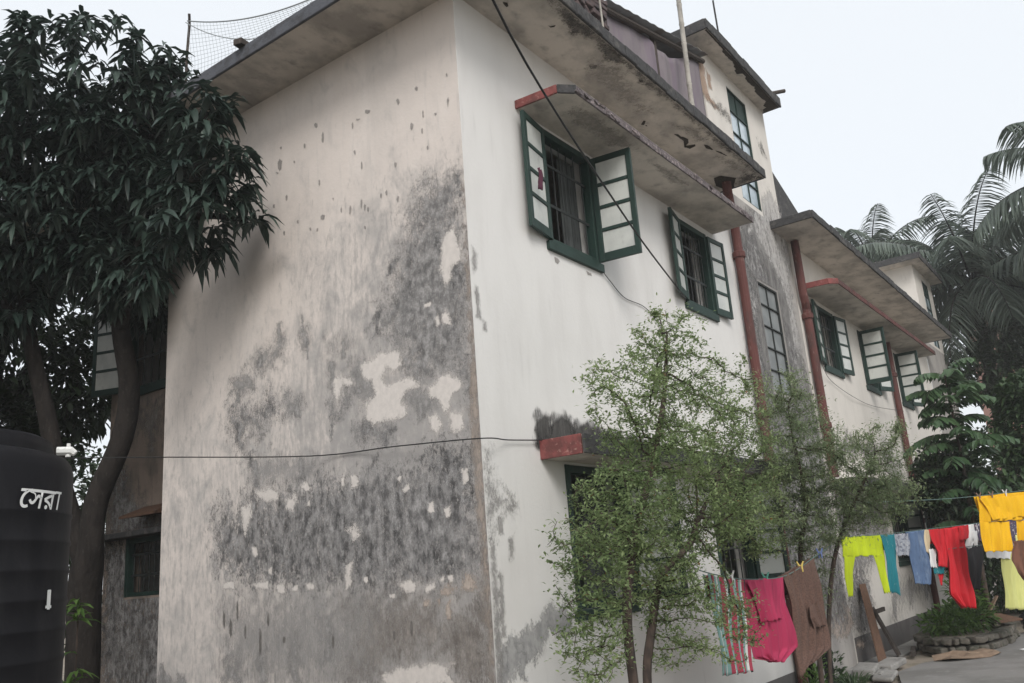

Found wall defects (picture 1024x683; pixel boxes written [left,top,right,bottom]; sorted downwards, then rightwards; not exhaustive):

damp [550,0,762,185]
crack [674,134,726,156]
peeling [439,225,471,293]
damp [373,168,487,421]
damp [298,315,310,359]
damp [535,409,651,449]
damp [740,210,889,641]
peeling [241,481,312,535]
damp [208,324,573,683]
peeling [332,311,495,683]
peeling [223,581,246,638]
peeling [253,567,314,594]